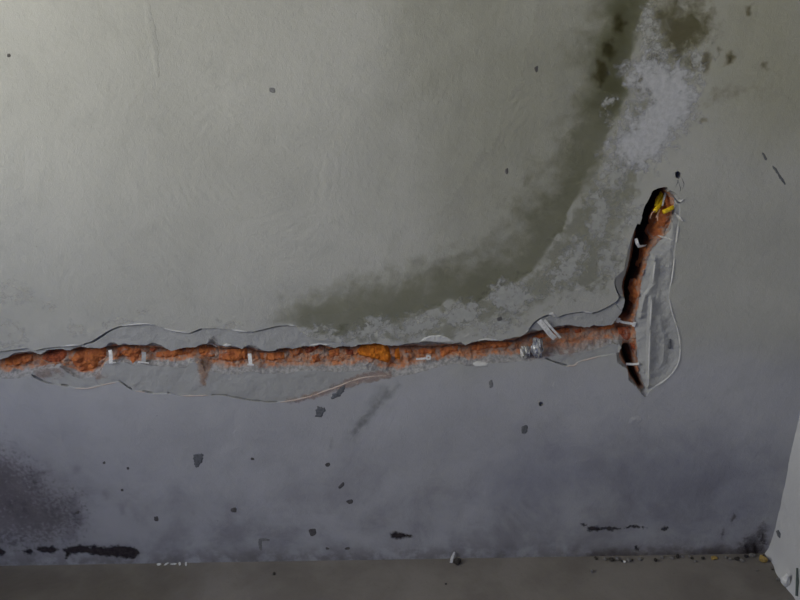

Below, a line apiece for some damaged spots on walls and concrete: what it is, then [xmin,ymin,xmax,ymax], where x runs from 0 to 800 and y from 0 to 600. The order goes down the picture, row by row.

damp [546,3,705,291]
damp [347,278,544,340]
flaking render [526,190,681,396]
flaking render [0,323,458,372]
flaking render [472,338,512,350]